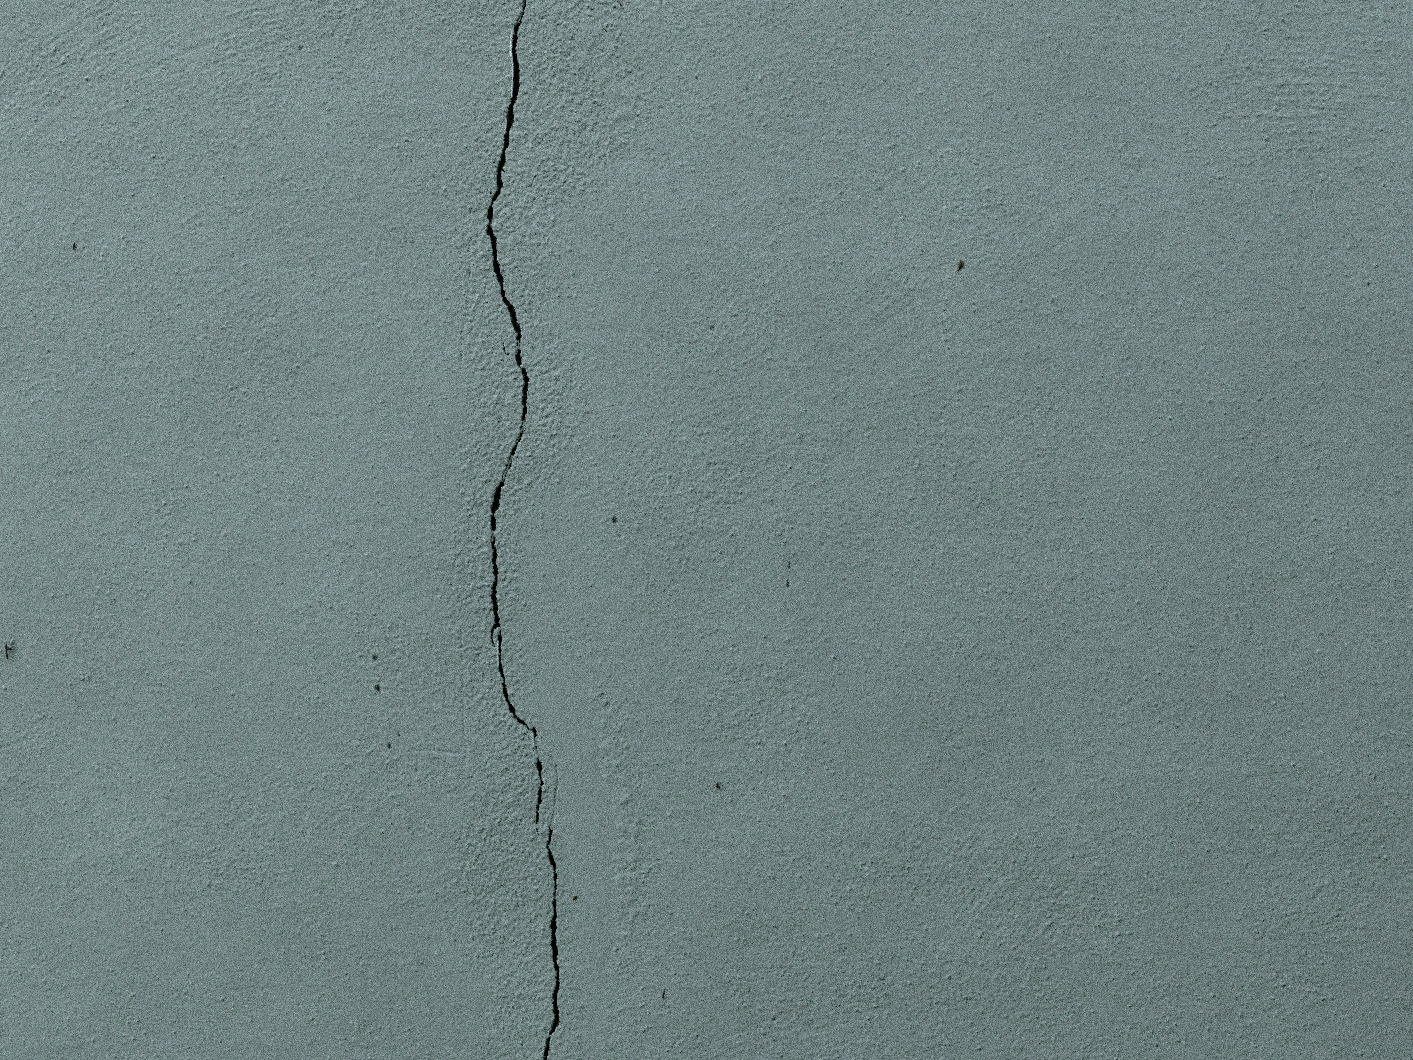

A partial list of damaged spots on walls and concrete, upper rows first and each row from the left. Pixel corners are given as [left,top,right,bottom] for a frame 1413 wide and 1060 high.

crack [468,0,560,1060]